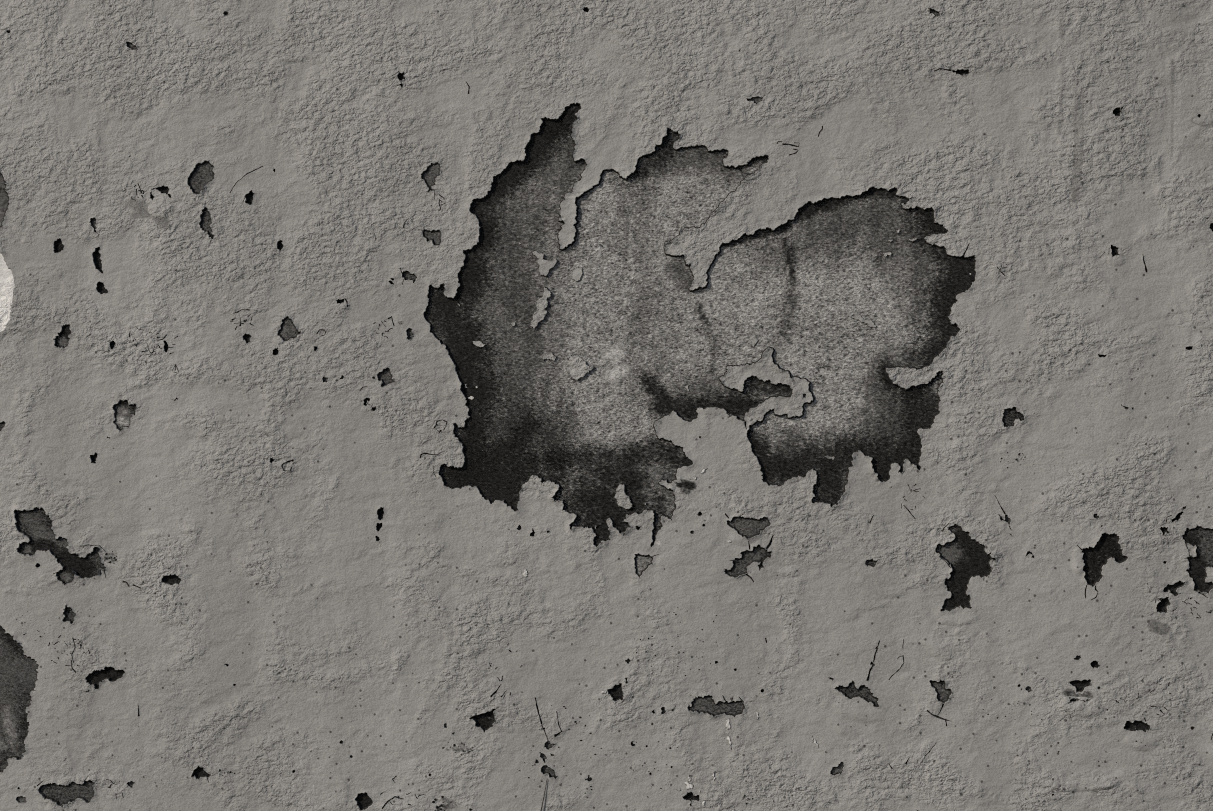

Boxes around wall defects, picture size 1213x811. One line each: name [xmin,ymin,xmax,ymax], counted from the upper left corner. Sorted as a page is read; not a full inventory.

peeling [187,160,215,239]
peeling [0,253,15,332]
peeling [388,103,977,582]
peeling [13,507,117,585]
peeling [935,523,996,612]
peeling [1077,513,1129,601]
peeling [1155,506,1213,613]
peeling [0,605,95,773]
peeling [85,667,125,692]
peeling [651,695,745,725]
peeling [828,640,880,708]
peeling [16,776,135,807]